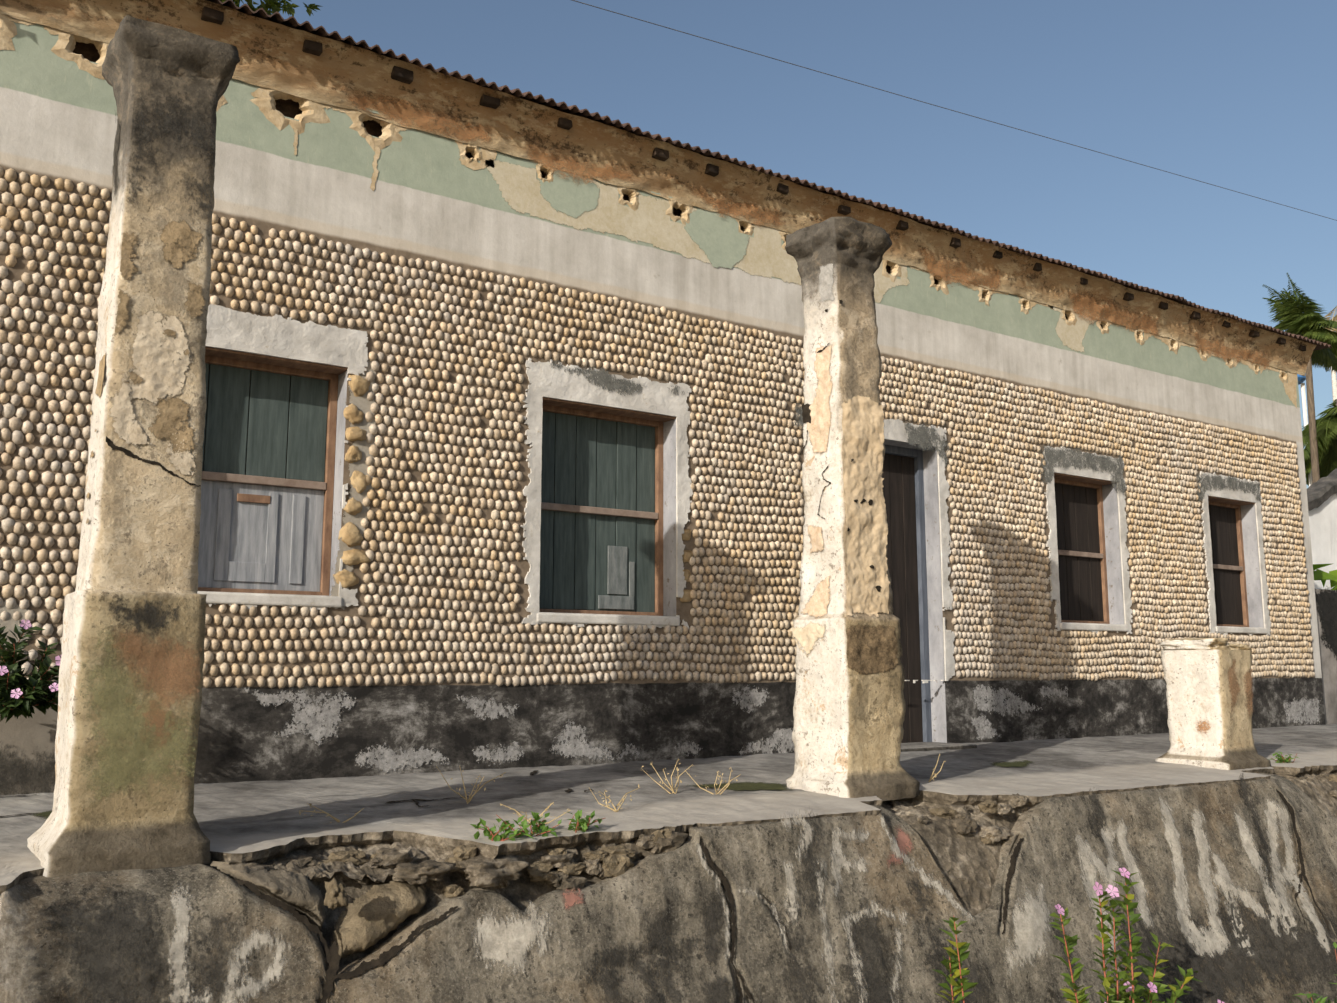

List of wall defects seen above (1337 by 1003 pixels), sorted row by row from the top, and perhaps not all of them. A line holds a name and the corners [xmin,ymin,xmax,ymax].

water stain [112,93,217,223]
peeling [160,220,202,269]
peeling [455,140,802,286]
peeling [874,262,929,303]
peeling [90,232,205,477]
peeling [947,276,1297,408]
peeling [802,345,833,454]
crack [105,436,201,487]
peeling [789,576,831,657]
spalling [846,624,899,675]
water stain [0,745,56,795]
water stain [686,781,793,791]